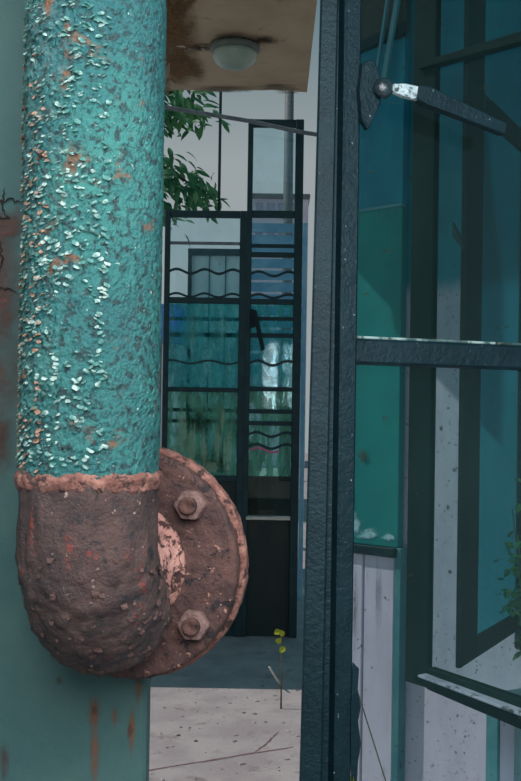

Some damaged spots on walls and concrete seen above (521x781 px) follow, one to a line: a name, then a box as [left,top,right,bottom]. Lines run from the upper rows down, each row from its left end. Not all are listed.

leakage [166,0,210,80]
crack [0,188,20,219]
peeling [354,514,394,541]